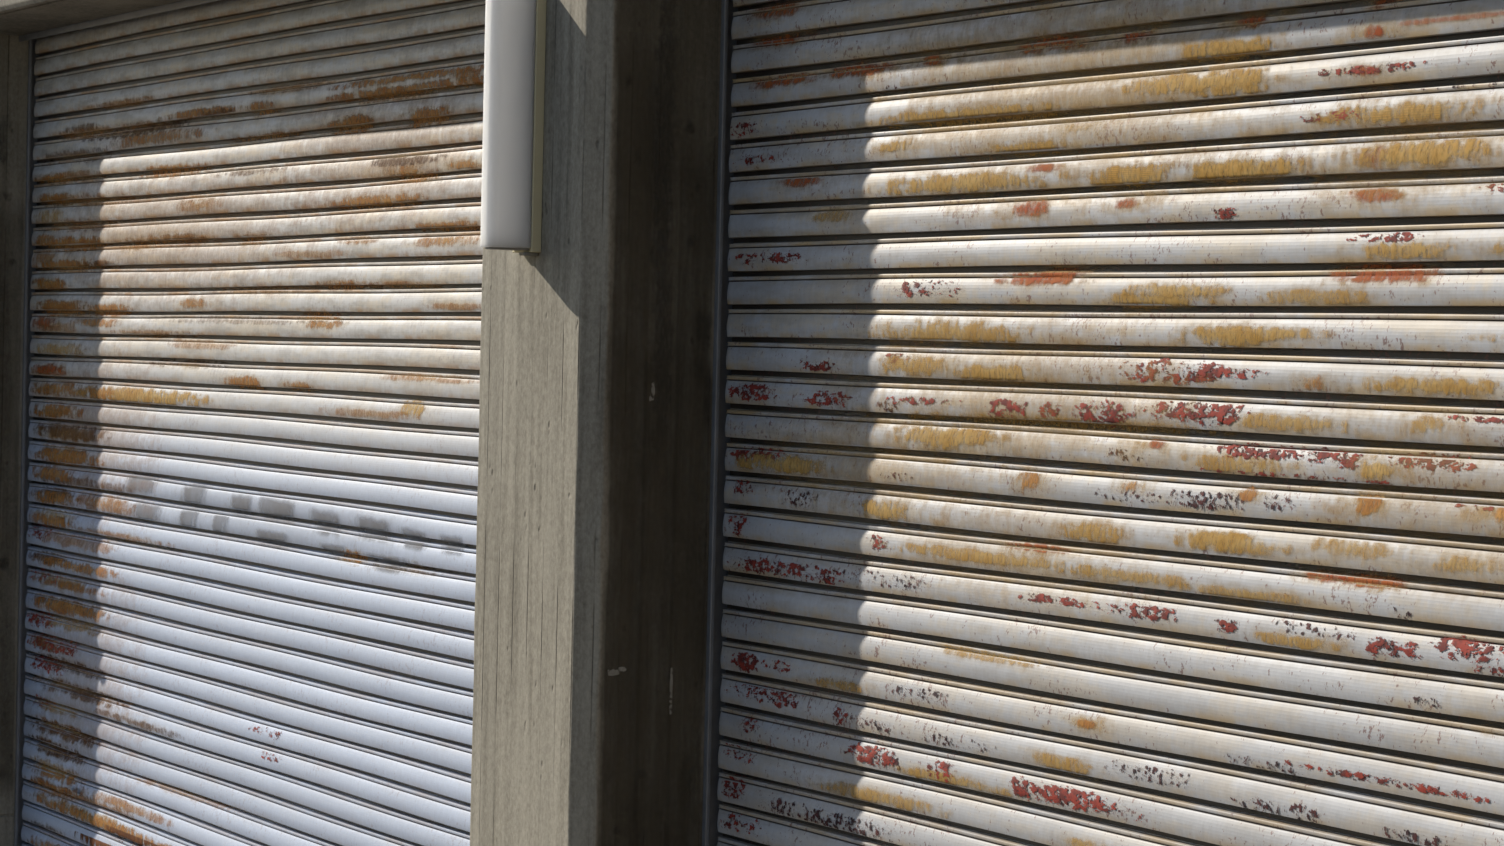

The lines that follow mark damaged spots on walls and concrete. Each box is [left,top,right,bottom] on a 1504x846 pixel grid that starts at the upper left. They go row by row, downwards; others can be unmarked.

rust [70,65,484,147]
rust [1267,242,1449,304]
rust [31,235,208,528]
peeling [985,358,1268,428]
peeling [1184,442,1477,511]
rust [900,523,1291,603]
peeling [1018,593,1176,623]
rust [1307,571,1403,591]
peeling [1275,620,1504,677]
rust [30,552,168,846]
peeling [1009,776,1142,822]
peeling [1227,754,1495,803]